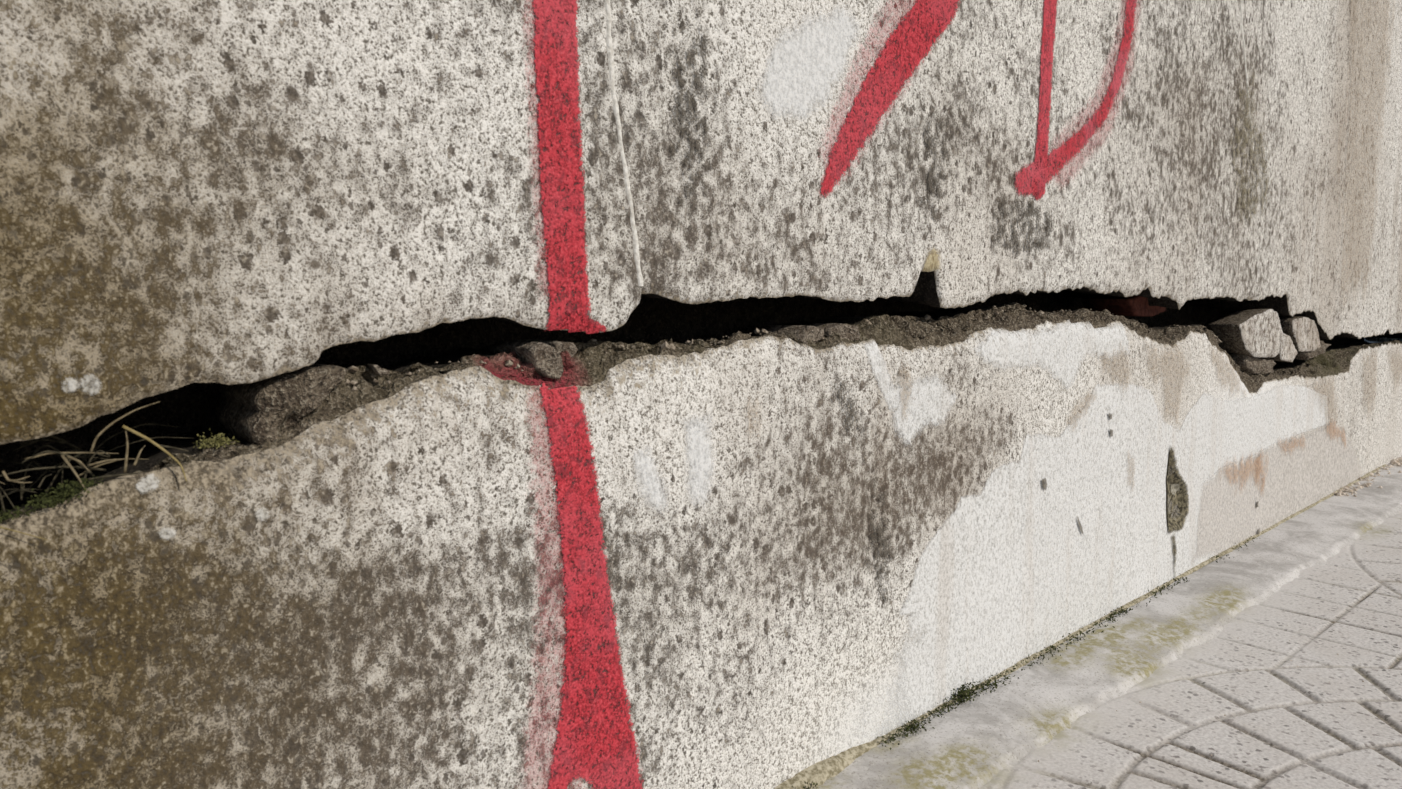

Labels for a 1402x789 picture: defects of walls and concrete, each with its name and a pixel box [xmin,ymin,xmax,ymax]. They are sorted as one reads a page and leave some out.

damp [1229,69,1273,226]
crack [0,271,1402,522]
damp [825,359,895,602]
peeling [865,342,956,445]
peeling [975,322,1130,388]
peeling [878,384,1361,737]